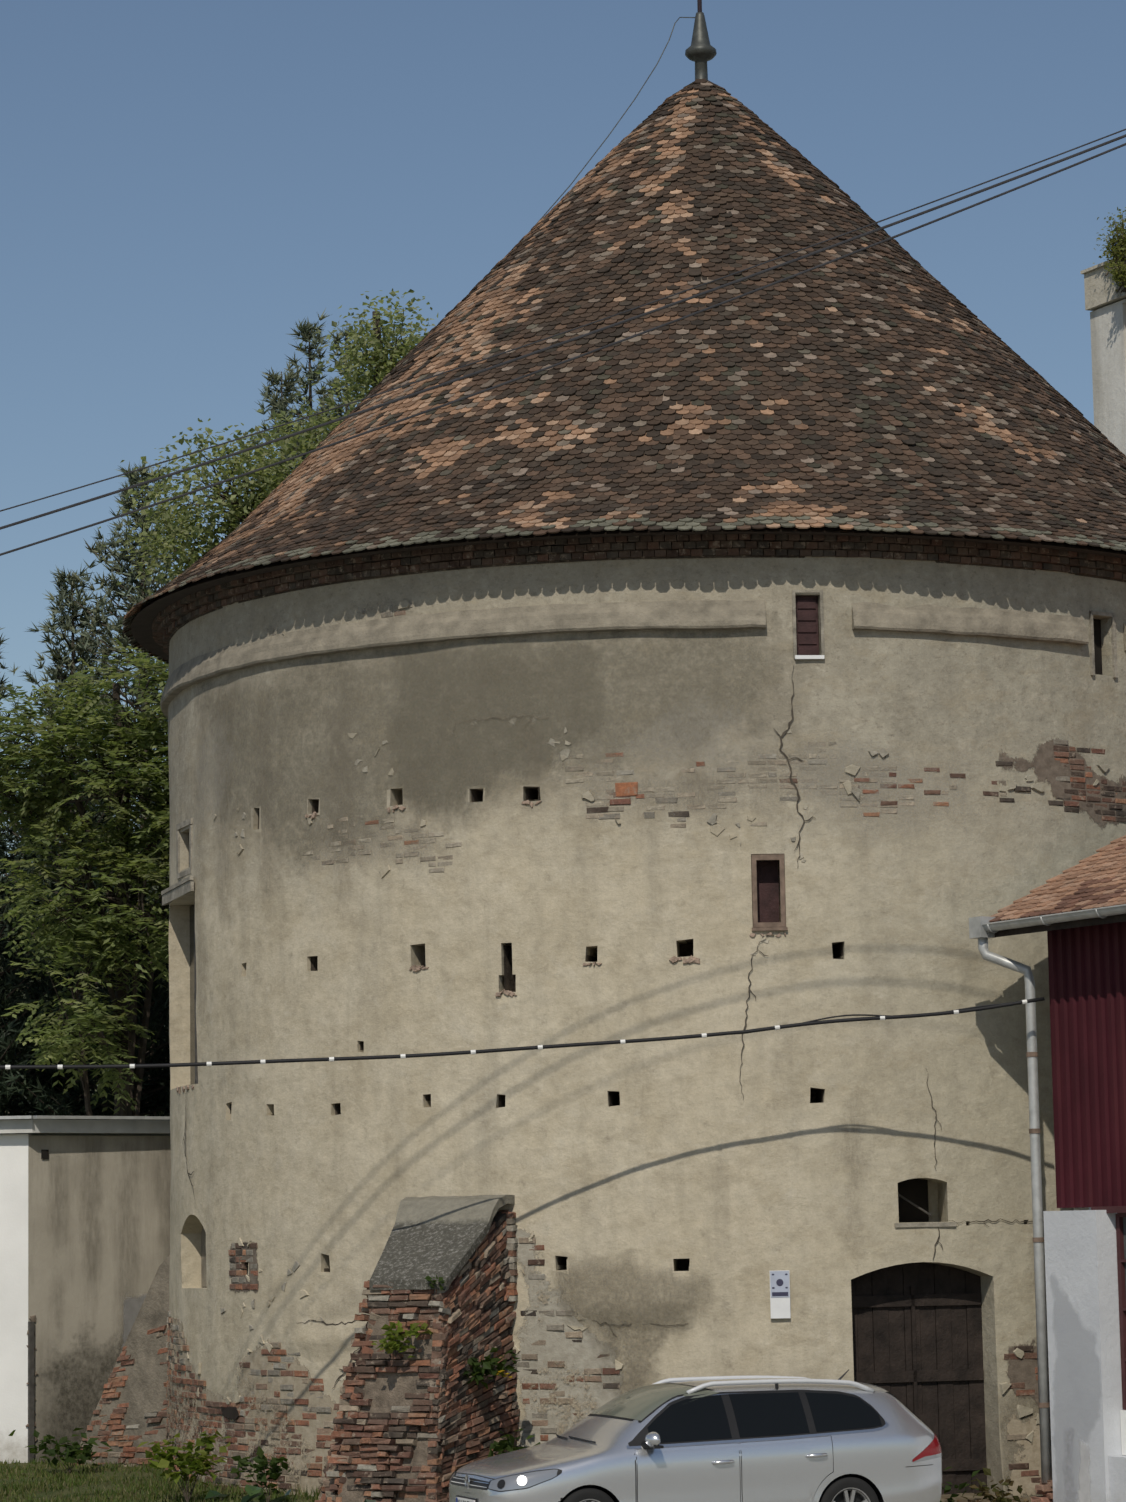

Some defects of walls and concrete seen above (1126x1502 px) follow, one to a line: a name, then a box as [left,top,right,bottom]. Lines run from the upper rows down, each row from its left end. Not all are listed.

spalling [301,805,462,878]
spalling [547,727,966,846]
crack [774,666,816,863]
spalling [983,738,1126,827]
crack [740,937,769,1098]
crack [182,1090,195,1199]
spalling [164,1238,338,1496]
spalling [999,1340,1052,1497]